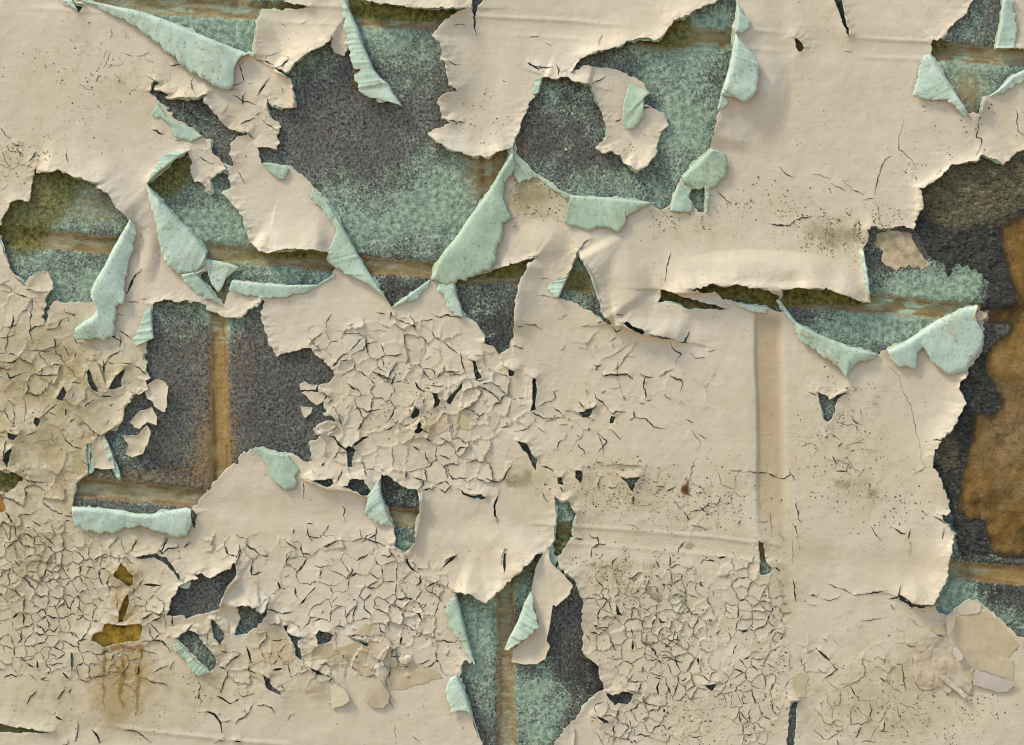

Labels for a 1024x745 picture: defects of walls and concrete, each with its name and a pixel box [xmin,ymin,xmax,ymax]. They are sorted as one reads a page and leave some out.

peeling [0,169,137,341]
crack [0,272,458,745]
peeling [137,497,633,745]
peeling [61,0,760,538]
crack [302,278,949,745]
peeling [658,150,1024,699]
peeling [834,0,850,36]
peeling [912,0,1024,116]